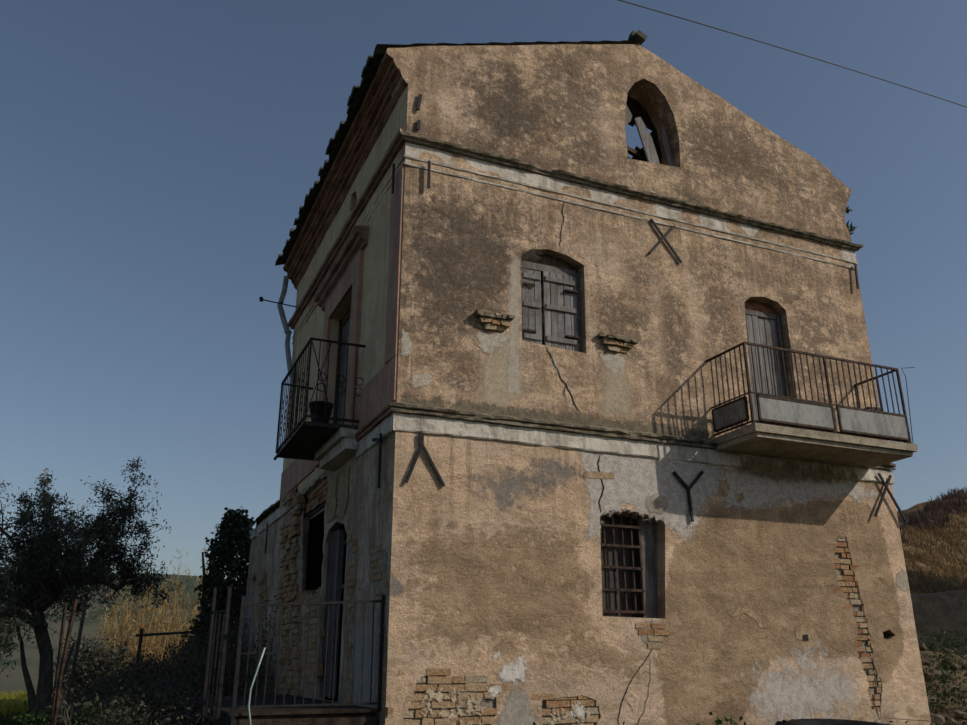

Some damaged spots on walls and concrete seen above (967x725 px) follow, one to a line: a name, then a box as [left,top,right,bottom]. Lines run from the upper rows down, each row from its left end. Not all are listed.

flaking render [474,309,511,356]
crack [546,347,580,412]
flaking render [600,333,634,374]
crack [596,454,604,512]
flaking render [255,488,305,697]
flaking render [827,537,884,712]
flaking render [377,627,530,725]
flaking render [531,693,619,725]